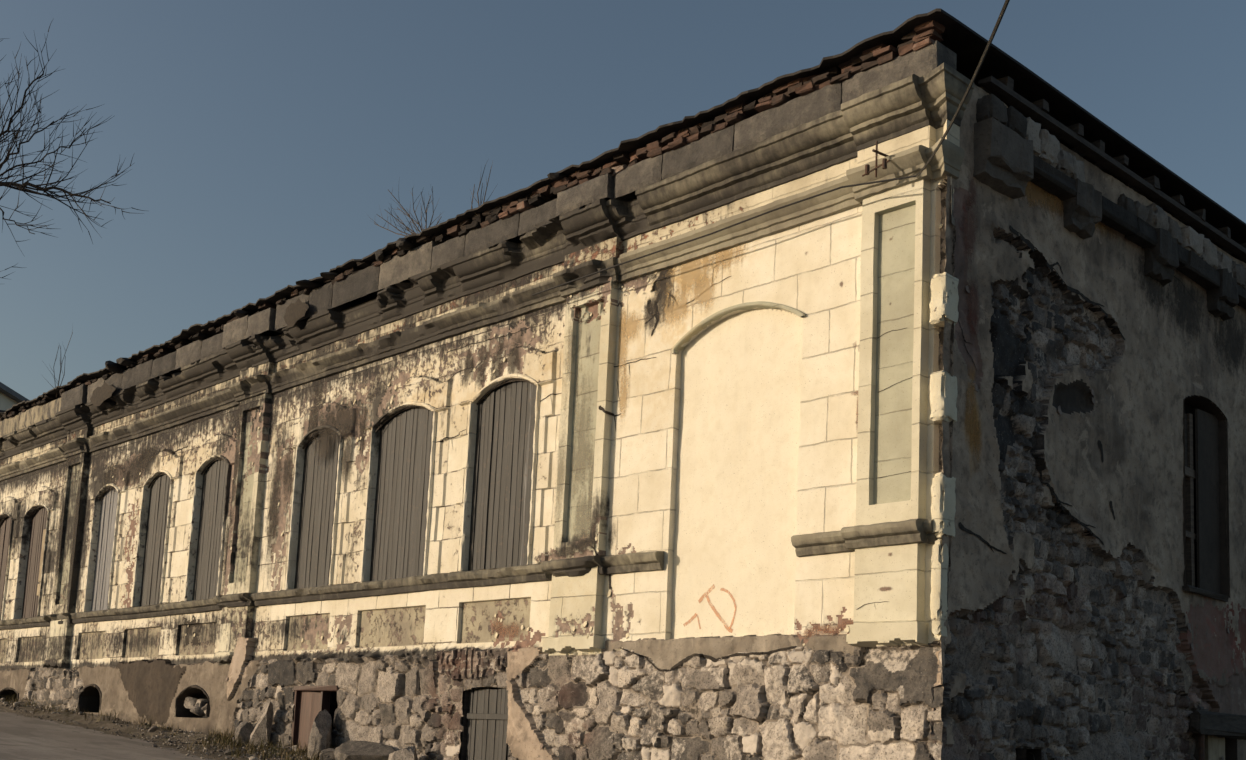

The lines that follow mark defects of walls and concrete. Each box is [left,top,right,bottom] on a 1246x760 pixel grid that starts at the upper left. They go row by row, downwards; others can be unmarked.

spalling [1117,193,1246,289]
water stain [618,250,739,366]
spalling [1052,379,1095,415]
peeling [221,371,410,595]
flaking render [112,452,146,608]
water stain [556,532,615,557]
crack [959,522,1007,554]
spalling [435,606,595,680]
peeling [607,587,634,643]
spalling [1015,748,1041,760]